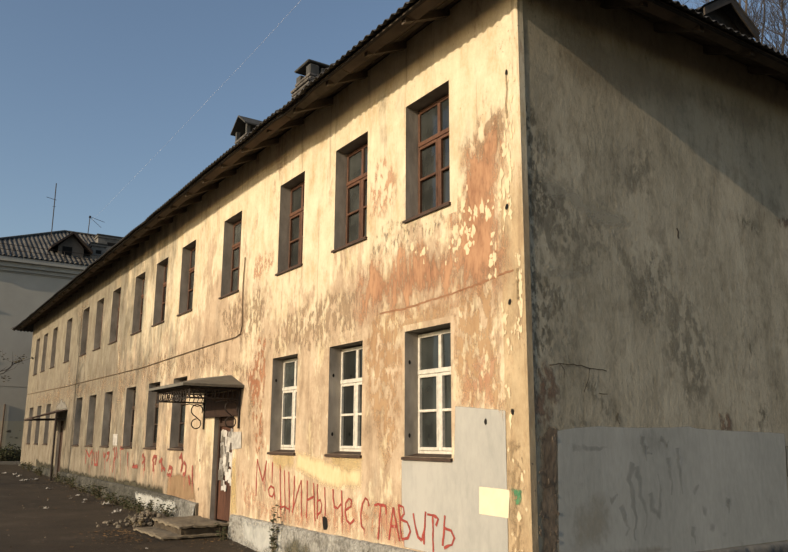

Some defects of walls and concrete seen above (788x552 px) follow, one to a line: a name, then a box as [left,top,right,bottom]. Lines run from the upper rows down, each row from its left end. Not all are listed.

peeling [356,74,515,322]
peeling [501,253,523,354]
crack [549,363,606,394]